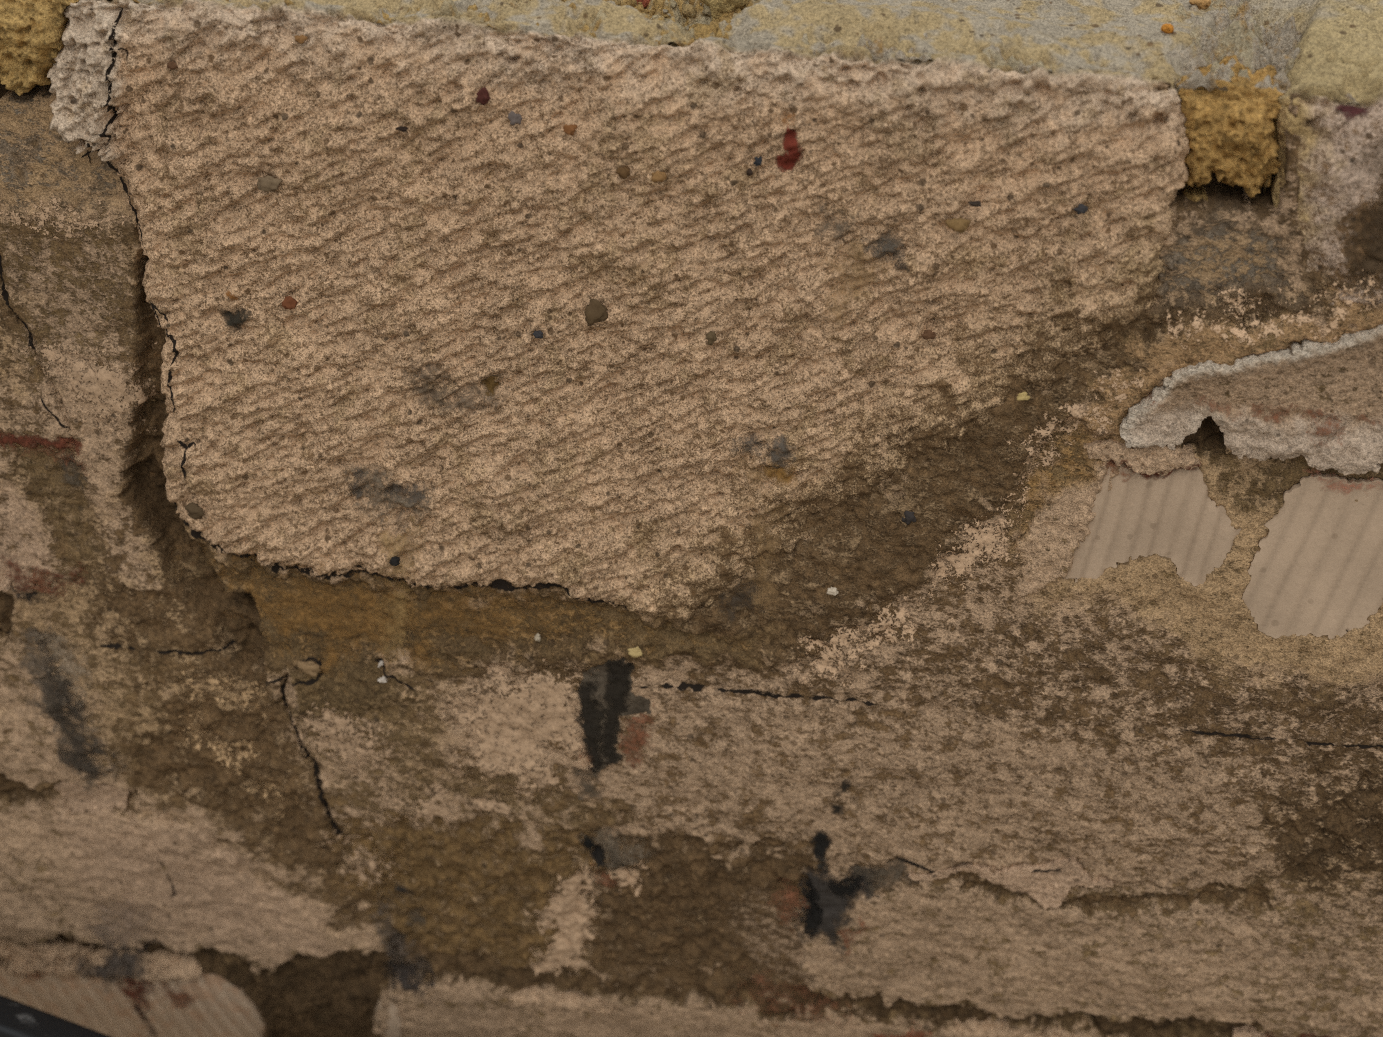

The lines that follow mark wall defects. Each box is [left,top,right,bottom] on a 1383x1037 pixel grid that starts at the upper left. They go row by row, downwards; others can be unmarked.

damp [1346,203,1383,293]
crack [0,255,35,349]
peeling [1210,286,1250,333]
crack [40,396,71,430]
peeling [1065,324,1383,639]
crack [641,682,891,706]
crack [266,657,351,846]
damp [575,660,634,801]
crack [1182,730,1383,749]
peeling [509,986,614,1016]
peeling [954,1016,1076,1037]